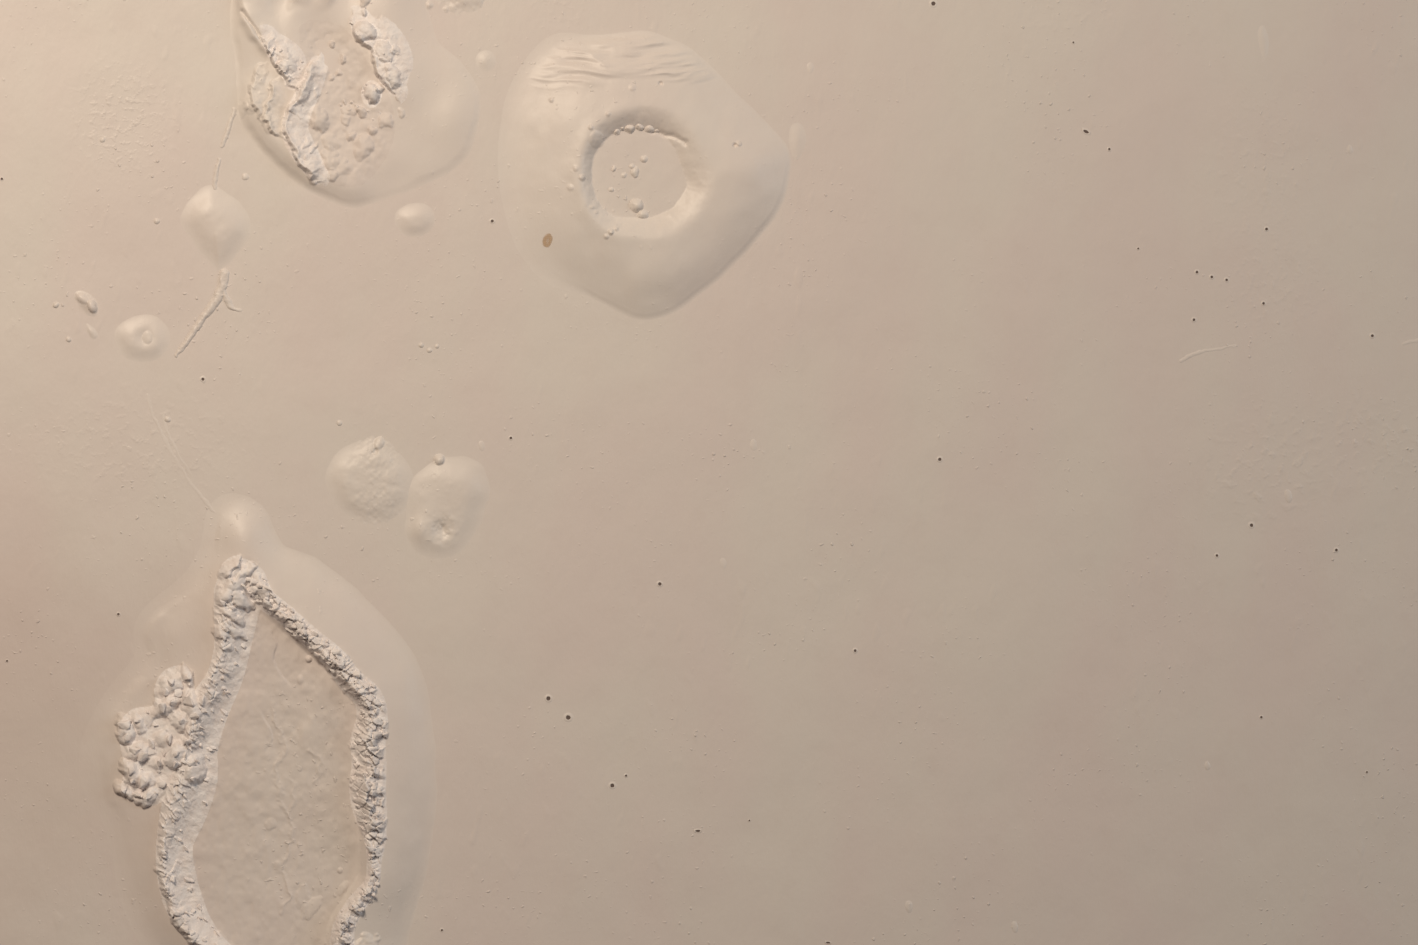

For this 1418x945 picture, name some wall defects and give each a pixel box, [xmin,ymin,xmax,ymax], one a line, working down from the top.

crack [175,268,242,358]